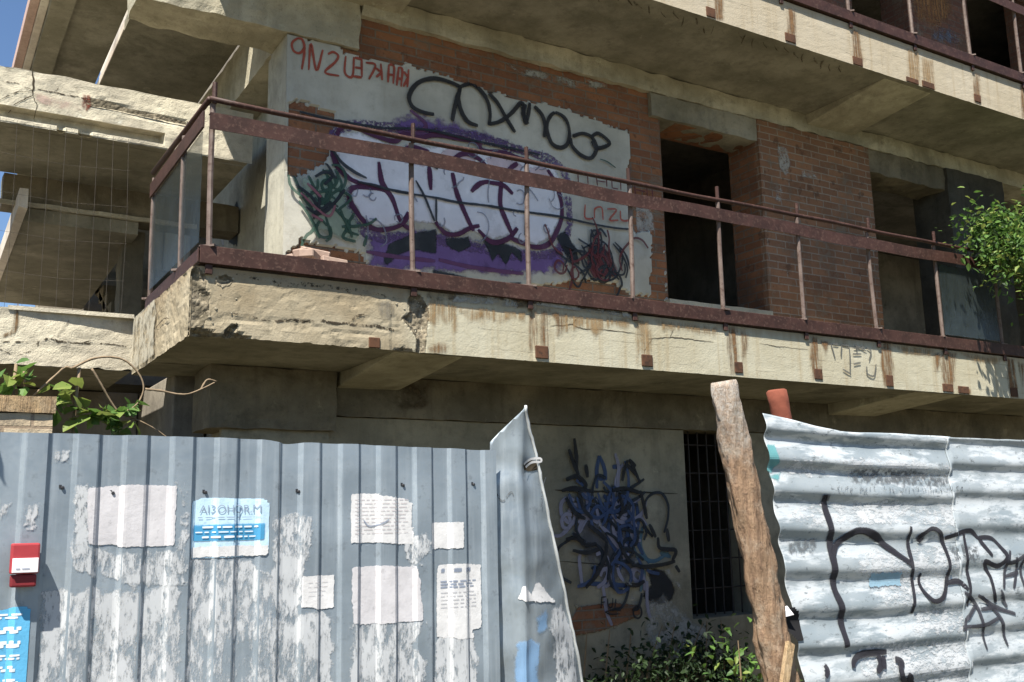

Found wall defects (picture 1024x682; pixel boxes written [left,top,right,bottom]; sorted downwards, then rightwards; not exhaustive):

corrosion [853,30,862,65]
crack [0,69,87,118]
peeling [289,102,335,135]
peeling [288,143,329,177]
peeling [341,21,666,302]
peeling [287,241,367,265]
spalling [188,267,249,339]
spalling [389,287,435,353]
corrosion [729,328,747,362]
corrosion [811,337,828,372]